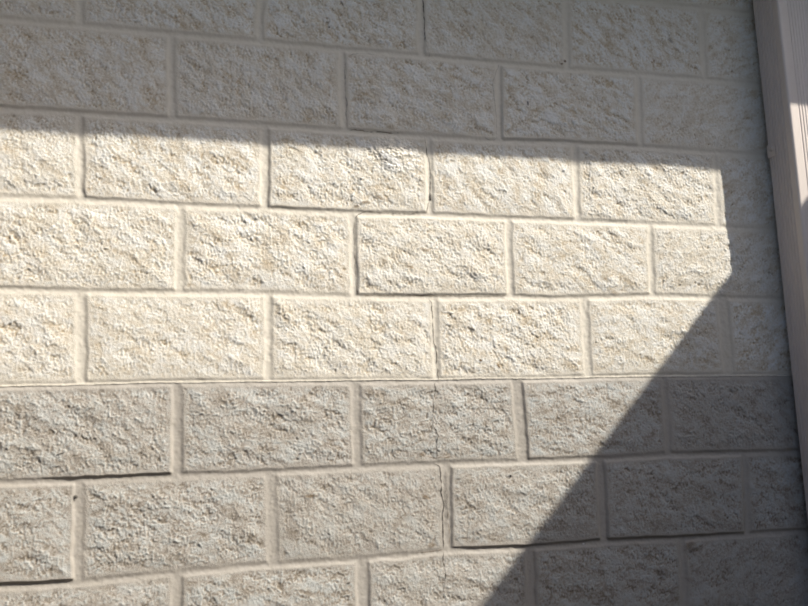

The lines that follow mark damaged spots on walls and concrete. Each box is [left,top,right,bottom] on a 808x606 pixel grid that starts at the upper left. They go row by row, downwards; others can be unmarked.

crack [354,241,450,597]